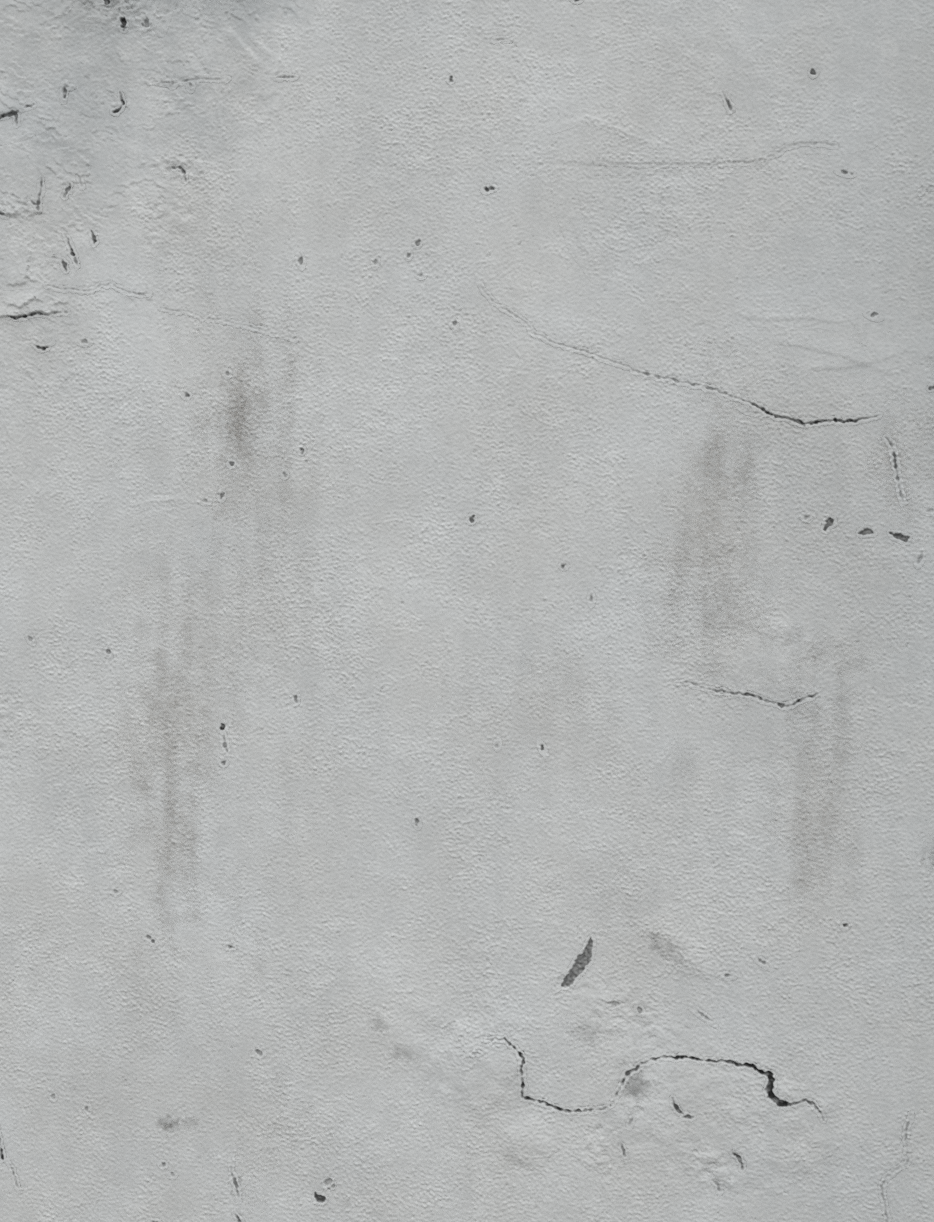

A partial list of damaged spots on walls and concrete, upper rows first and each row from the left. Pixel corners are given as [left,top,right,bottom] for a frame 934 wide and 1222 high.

crack [0,101,37,129]
crack [2,280,300,343]
crack [477,282,908,507]
crack [925,383,934,393]
crack [673,677,821,712]
peeling [551,935,597,993]
crack [468,1034,827,1160]